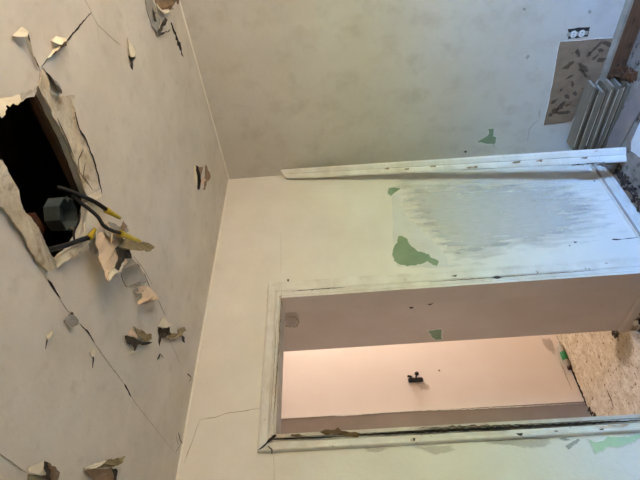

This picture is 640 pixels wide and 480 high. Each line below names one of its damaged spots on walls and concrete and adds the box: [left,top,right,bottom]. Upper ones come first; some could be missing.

peeling [145,0,179,37]
crack [28,0,97,87]
peeling [194,165,211,190]
peeling [387,187,449,268]
peeling [89,221,159,305]
crack [48,280,70,313]
peeling [125,316,186,355]
spalling [426,329,443,340]
crack [81,291,282,462]
peeling [555,424,640,454]
peeling [27,461,60,480]
peeling [83,456,125,480]